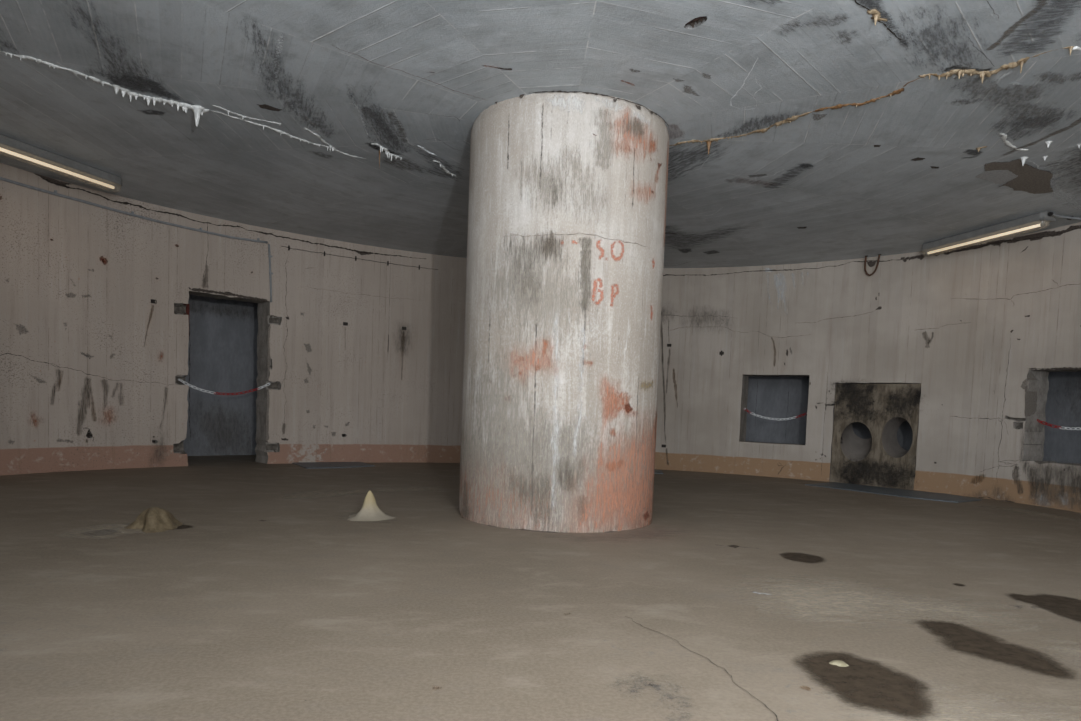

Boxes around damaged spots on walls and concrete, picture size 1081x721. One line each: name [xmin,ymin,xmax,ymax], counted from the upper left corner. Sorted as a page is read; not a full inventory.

crack [855,0,906,45]
damp [0,8,457,179]
damp [668,0,1081,178]
corrosion [617,113,655,152]
peeling [976,158,1054,194]
corrosion [601,379,635,435]